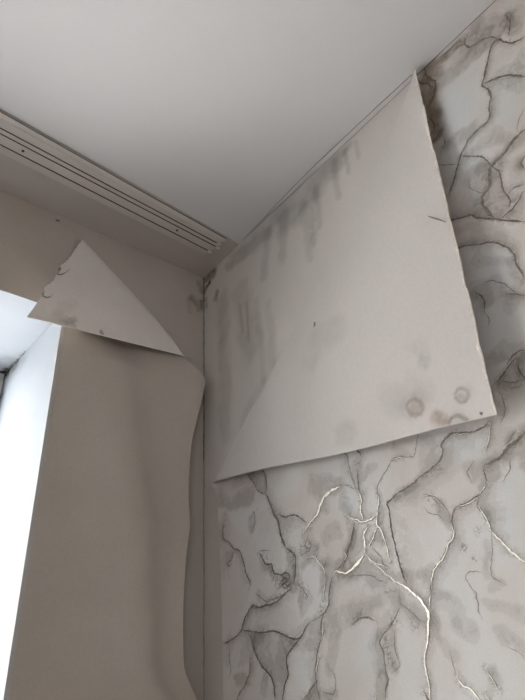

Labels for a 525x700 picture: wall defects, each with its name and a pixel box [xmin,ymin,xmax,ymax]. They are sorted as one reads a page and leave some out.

peeling [27,240,184,356]
peeling [214,68,497,482]